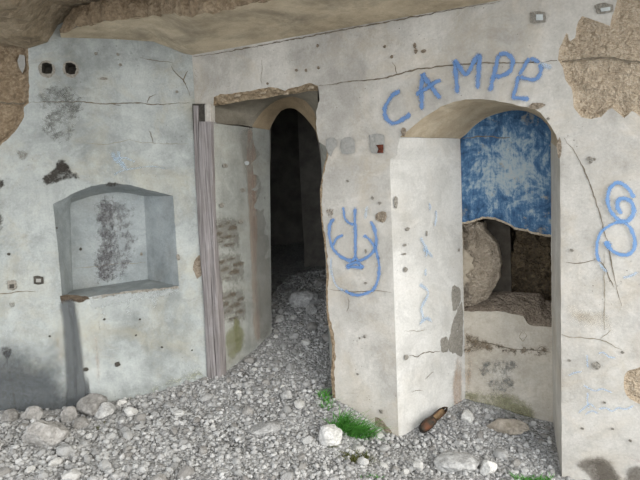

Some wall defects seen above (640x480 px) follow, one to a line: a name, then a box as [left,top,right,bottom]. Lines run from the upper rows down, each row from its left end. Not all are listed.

spalling [0,46,29,145]
leakage [40,87,79,138]
crack [0,94,176,106]
crack [194,1,500,83]
crack [319,56,640,86]
spalling [558,0,640,119]
leakage [95,202,129,281]
leakage [216,219,246,347]
spalling [440,217,552,357]
crack [561,138,622,348]
spalling [624,367,640,404]